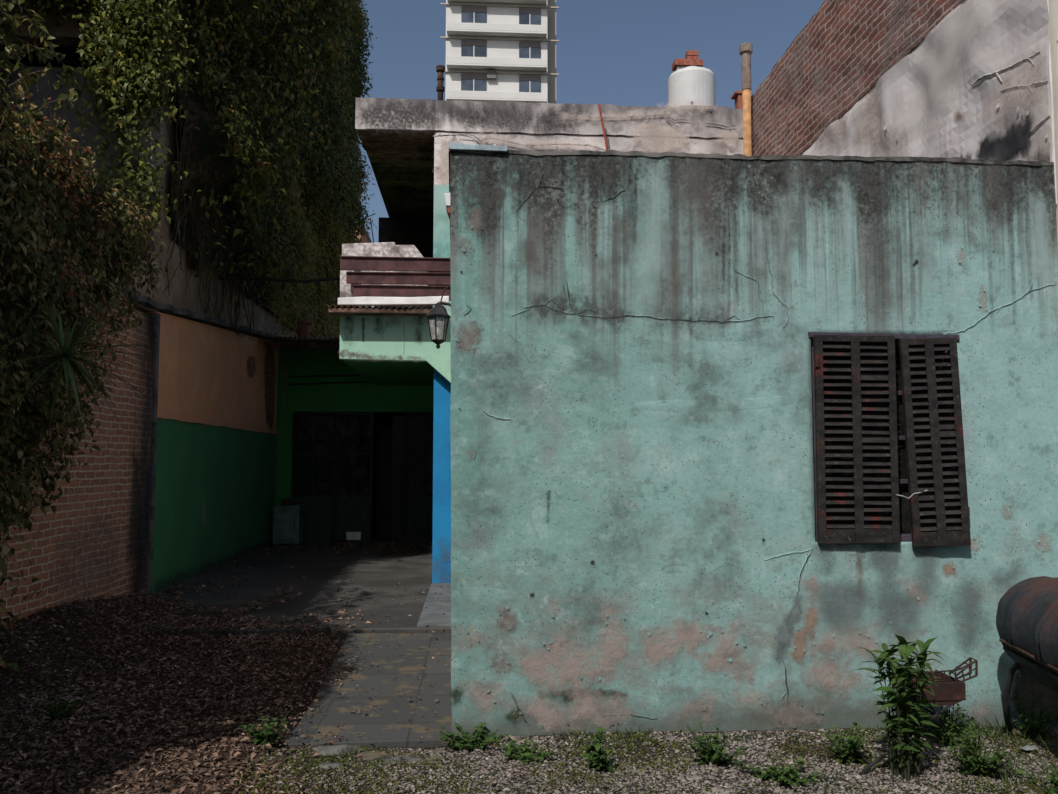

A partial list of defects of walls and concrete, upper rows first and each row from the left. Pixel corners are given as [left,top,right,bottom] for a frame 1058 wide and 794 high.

water stain [462,154,561,238]
crack [511,154,789,328]
water stain [535,296,624,322]
crack [942,283,1056,335]
crack [764,547,814,598]
peeling [792,608,818,663]
peeling [519,693,632,730]
crack [780,661,795,725]